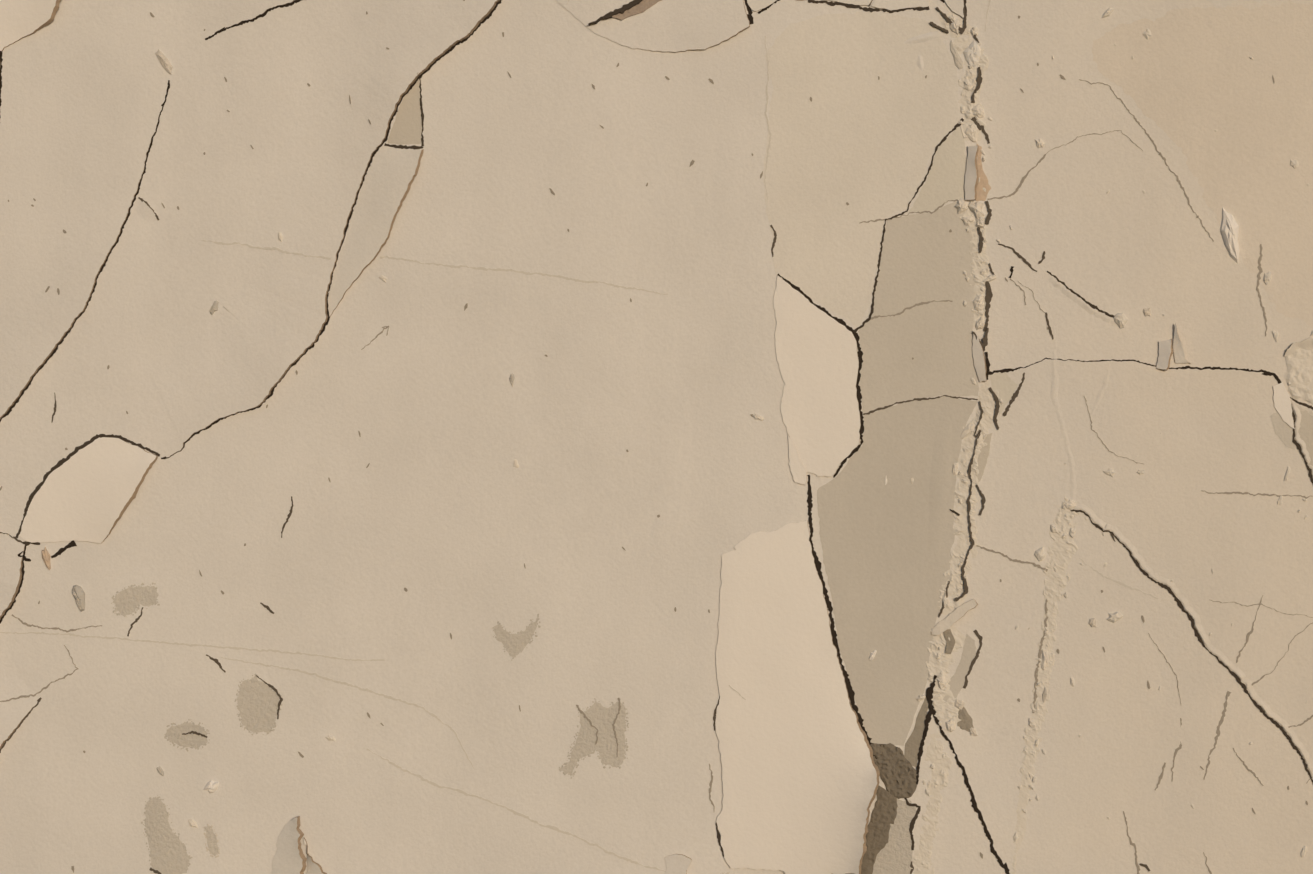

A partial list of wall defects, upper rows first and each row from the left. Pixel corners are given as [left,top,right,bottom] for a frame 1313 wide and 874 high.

peeling [0,0,61,51]
crack [588,0,643,26]
peeling [556,0,777,53]
peeling [328,78,424,316]
crack [0,0,501,753]
peeling [708,0,1017,874]
crack [743,0,1313,790]
crack [576,698,621,757]
crack [712,696,720,731]
crack [904,630,1037,874]
crack [709,764,724,857]
crack [1123,811,1150,874]